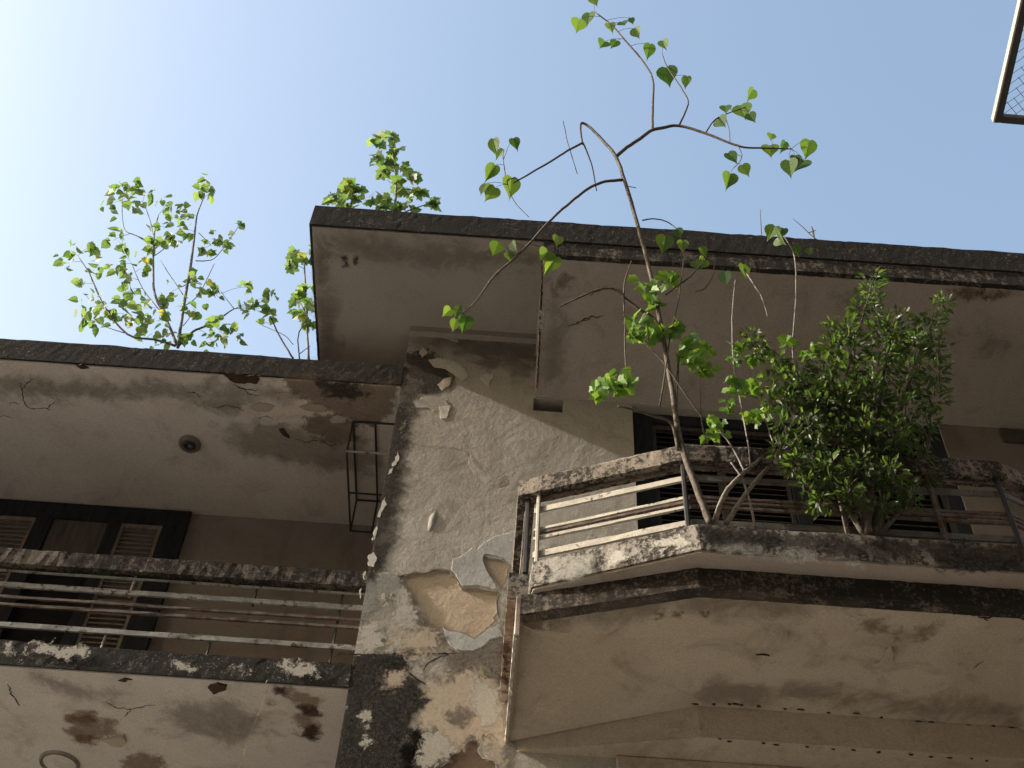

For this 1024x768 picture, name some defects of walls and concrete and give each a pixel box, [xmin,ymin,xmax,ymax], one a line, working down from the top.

crack [568,289,622,327]
crack [0,379,55,420]
peeling [414,347,494,420]
water stain [283,349,454,768]
peeling [359,498,387,598]
peeling [398,531,515,651]
water stain [549,556,592,579]
water stain [609,550,630,566]
water stain [649,521,1024,574]
water stain [451,636,504,681]
water stain [64,711,117,745]
flaking render [414,669,513,768]